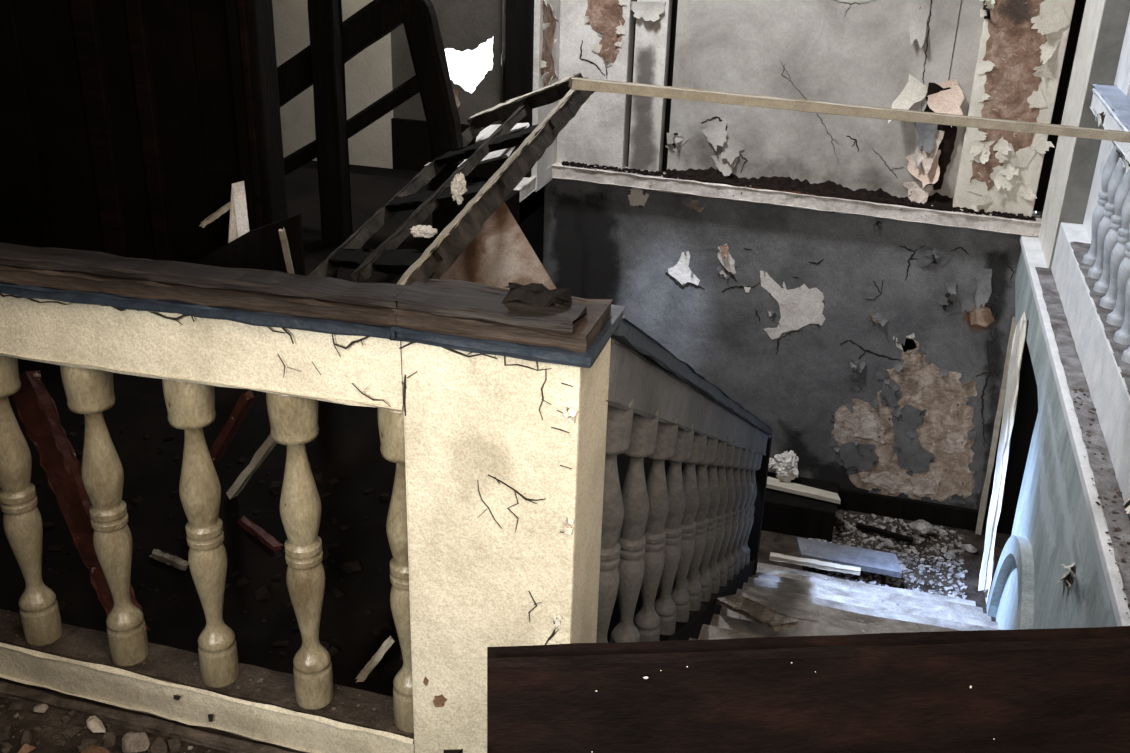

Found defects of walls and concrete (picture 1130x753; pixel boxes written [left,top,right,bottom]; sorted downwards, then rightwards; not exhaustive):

peeling [583,0,627,67]
peeling [888,0,1070,211]
peeling [665,251,705,290]
peeling [760,271,825,340]
crack [268,327,368,378]
crack [352,342,417,416]
crack [442,347,573,433]
spalling [828,310,980,504]
crack [477,474,546,532]